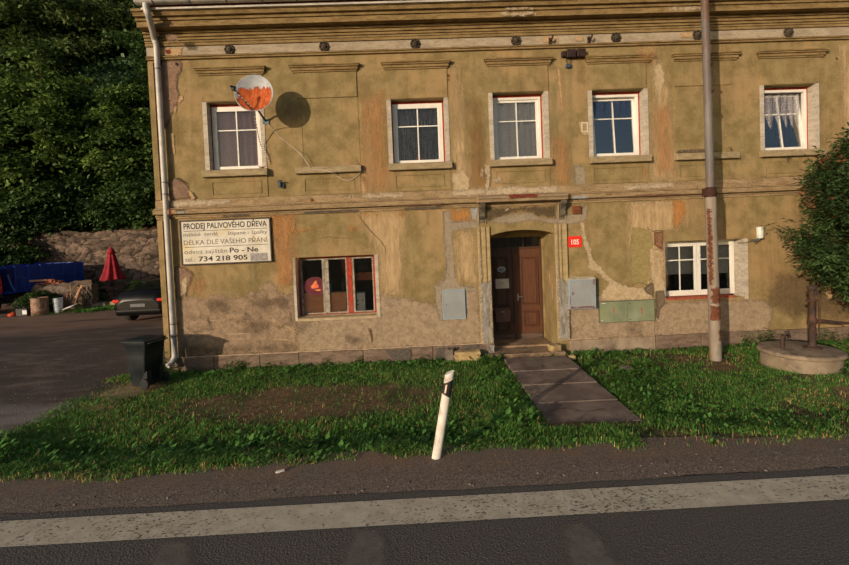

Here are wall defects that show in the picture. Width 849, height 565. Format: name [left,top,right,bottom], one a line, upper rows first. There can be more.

spalling [160,22,185,154]
flaking render [169,181,493,357]
flaking render [549,181,709,340]
flaking render [720,298,773,332]